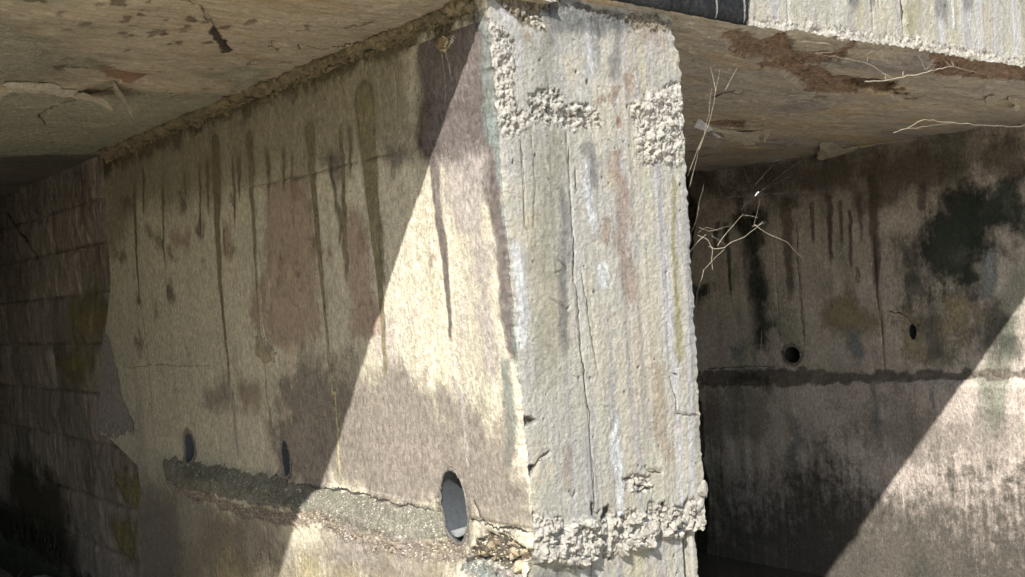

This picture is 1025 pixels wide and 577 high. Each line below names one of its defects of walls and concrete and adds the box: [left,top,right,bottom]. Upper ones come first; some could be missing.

spalling [496,0,564,30]
spalling [578,2,673,33]
spalling [0,0,478,178]
damp [417,8,527,375]
damp [584,155,595,231]
damp [685,129,1025,289]
damp [109,81,533,577]
spalling [166,480,523,577]
crack [297,484,439,512]
crack [466,555,513,563]
crack [471,500,531,532]
damp [707,441,1025,577]